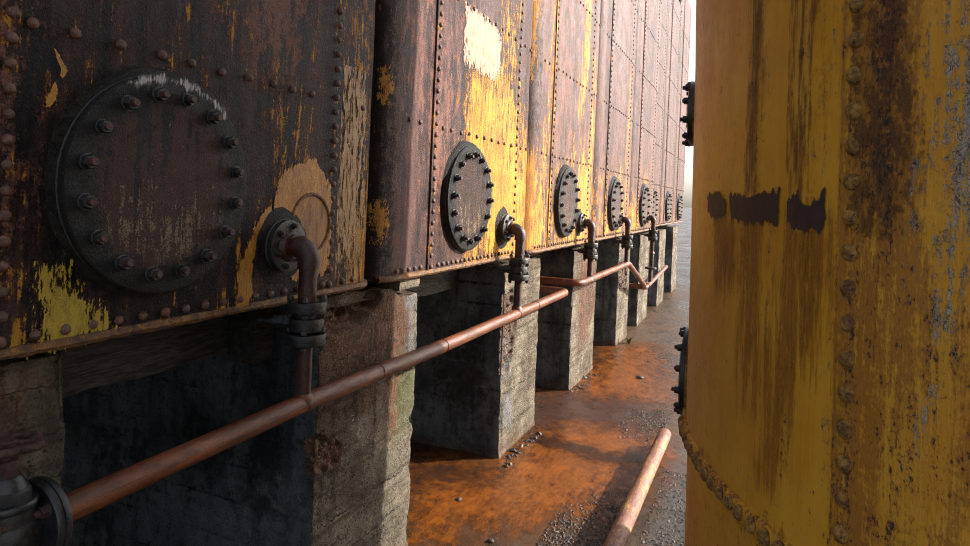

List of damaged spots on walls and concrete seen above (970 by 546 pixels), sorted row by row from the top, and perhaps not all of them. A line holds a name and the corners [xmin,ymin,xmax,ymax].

rust [744,0,764,197]
rust [786,0,820,200]
rust [845,0,928,241]
rust [407,344,675,545]